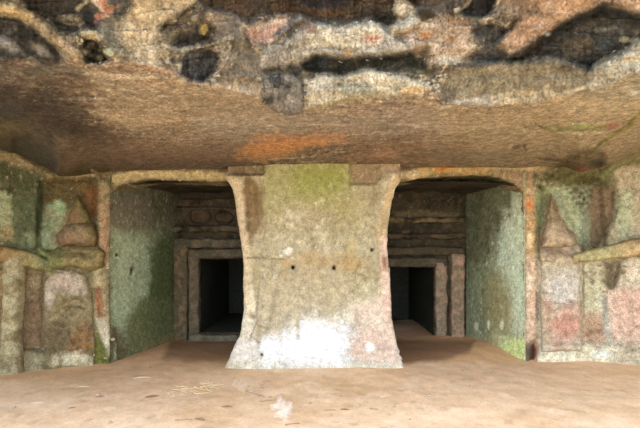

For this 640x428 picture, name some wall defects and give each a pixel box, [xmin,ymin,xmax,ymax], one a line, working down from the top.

water stain [241,173,270,246]
water stain [292,164,352,206]
water stain [44,255,174,369]